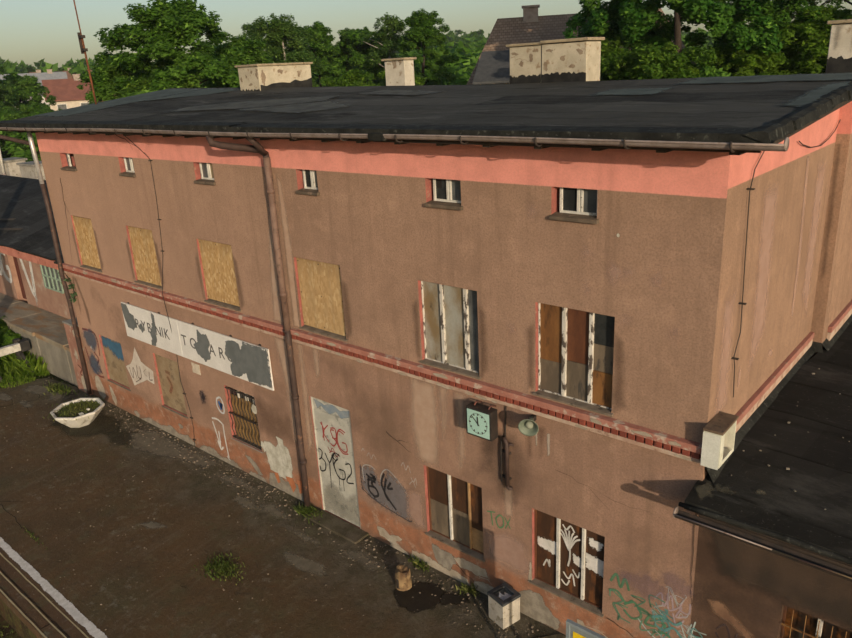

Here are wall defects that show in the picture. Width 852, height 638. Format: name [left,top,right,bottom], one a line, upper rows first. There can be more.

peeling [134,410,304,502]
peeling [377,526,494,613]